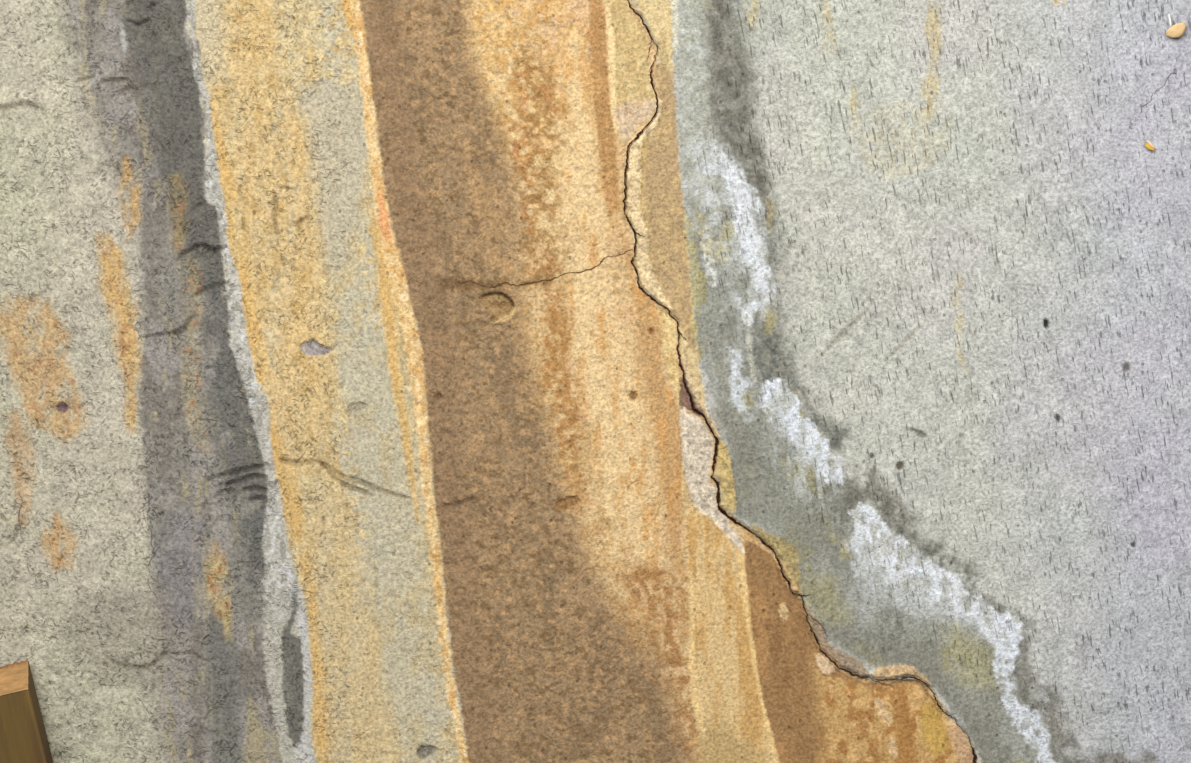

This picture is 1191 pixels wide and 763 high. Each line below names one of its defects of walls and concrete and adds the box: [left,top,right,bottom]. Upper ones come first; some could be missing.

leakage [48,0,317,763]
corrosion [473,0,780,763]
crack [457,0,977,763]
leakage [667,0,1164,763]